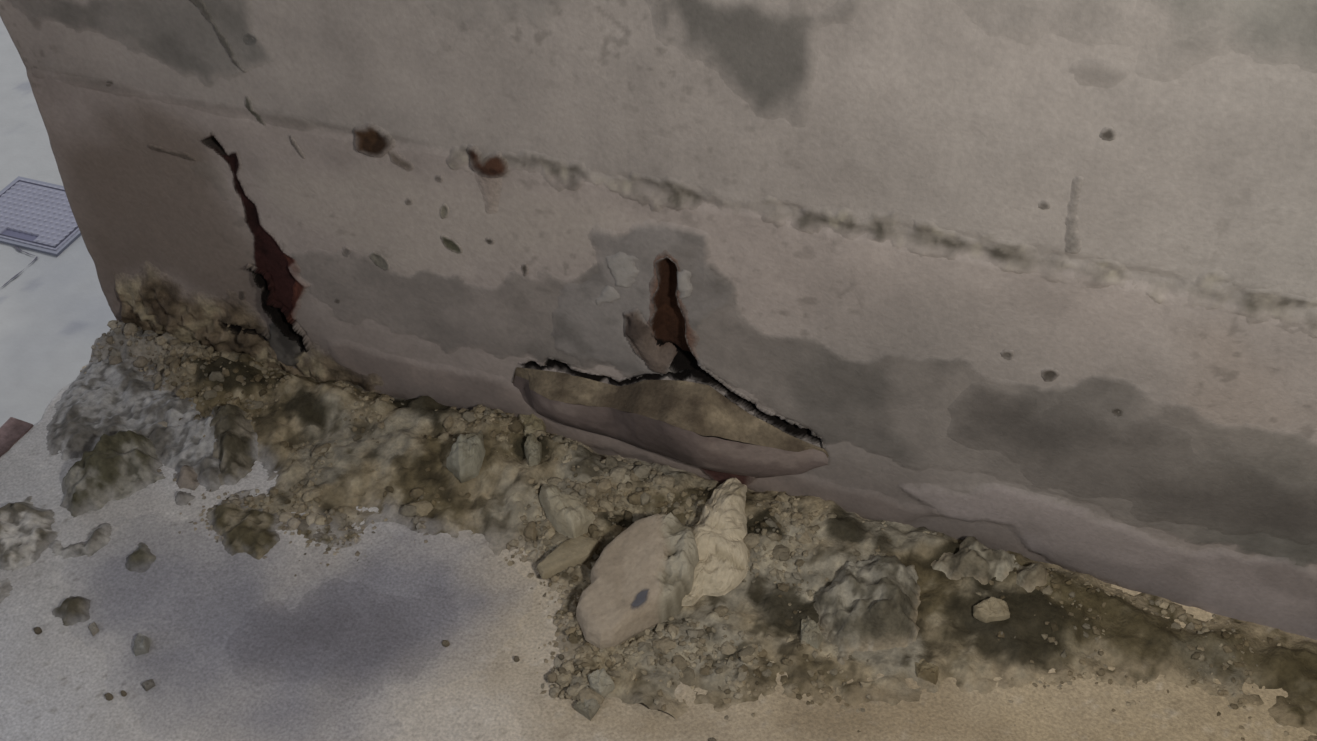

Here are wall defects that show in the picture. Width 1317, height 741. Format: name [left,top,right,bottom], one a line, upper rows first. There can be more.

crack [189,0,306,159]
leakage [645,0,863,128]
rust [354,122,414,172]
rust [467,144,509,214]
crack [148,131,313,366]
spalling [113,260,384,394]
leakage [280,238,712,480]
spalling [623,250,700,374]
crack [518,336,825,449]
leakage [696,258,1317,640]
spalling [1041,367,1060,382]
leakage [61,512,537,741]